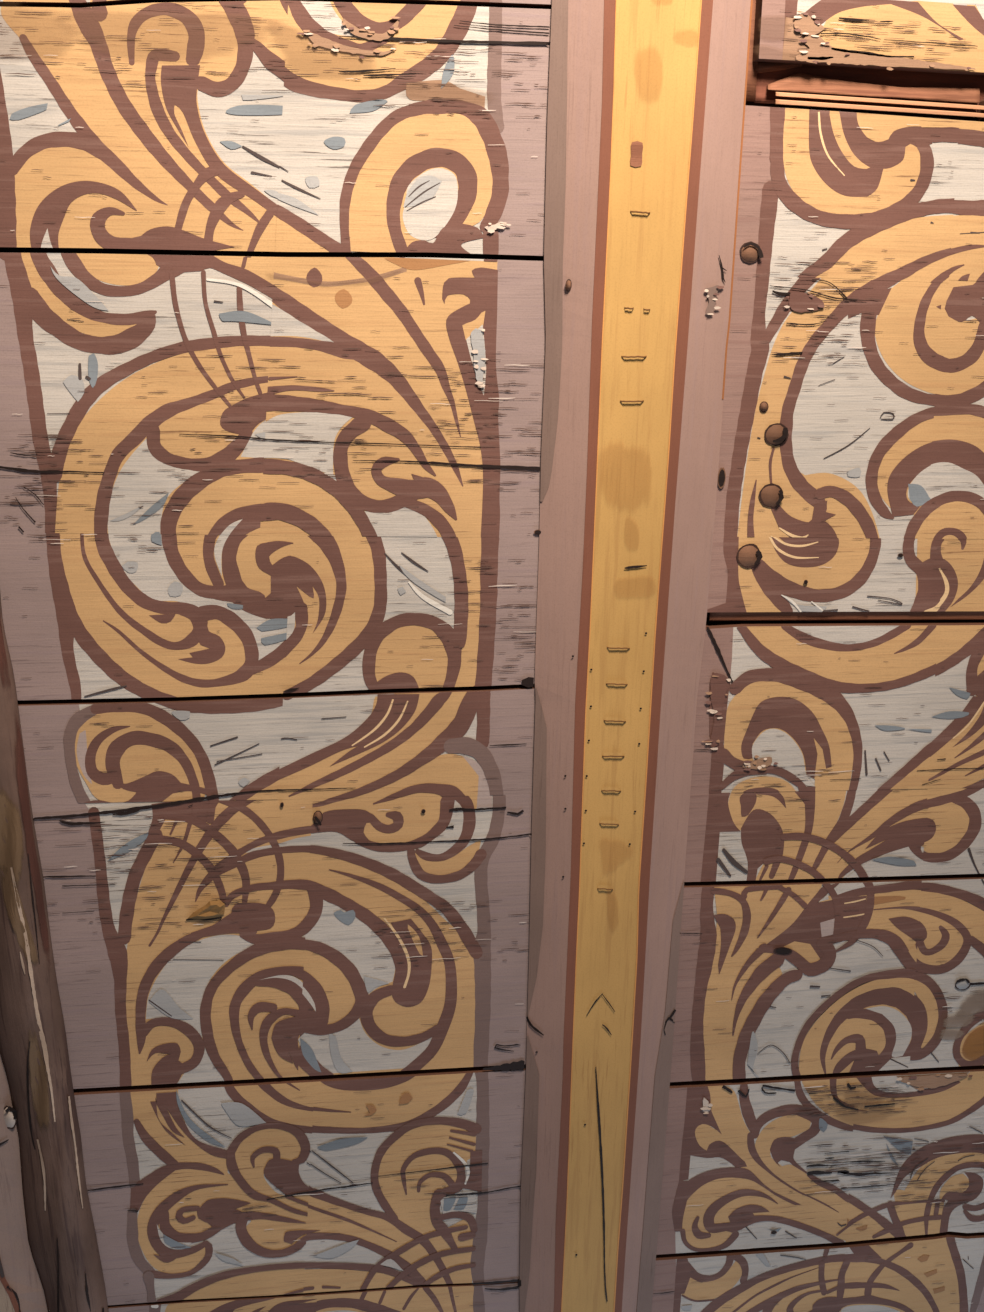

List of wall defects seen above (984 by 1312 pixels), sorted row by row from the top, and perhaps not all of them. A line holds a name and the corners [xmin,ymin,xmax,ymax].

damp [940,990,984,1059]